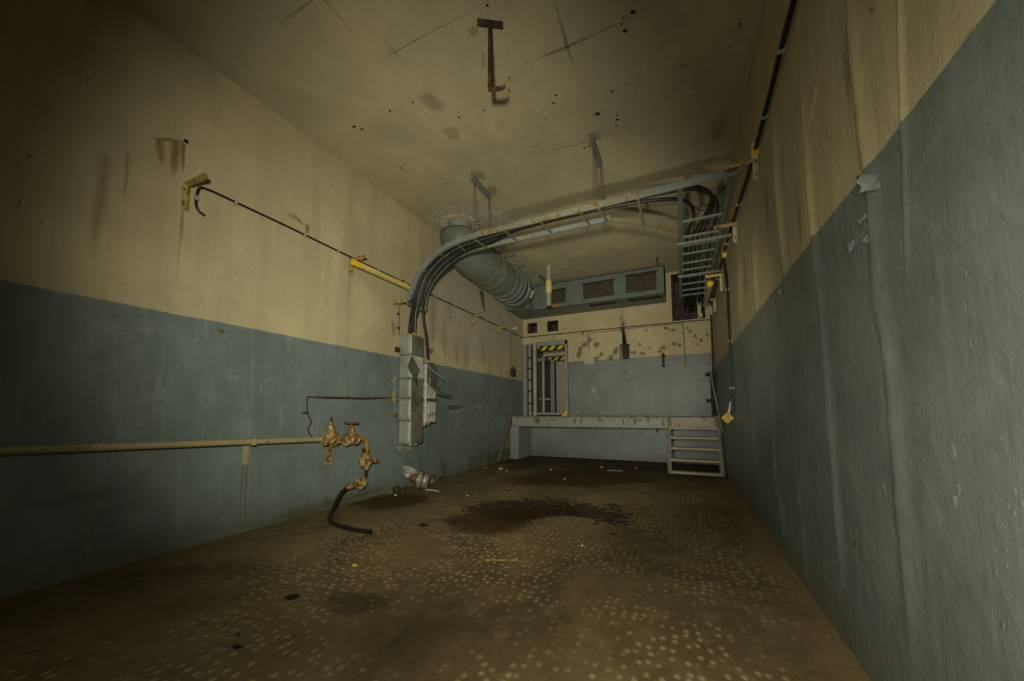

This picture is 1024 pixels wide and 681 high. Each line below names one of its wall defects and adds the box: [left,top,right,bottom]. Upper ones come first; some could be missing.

peeling [856,172,880,194]
water stain [449,499,593,533]